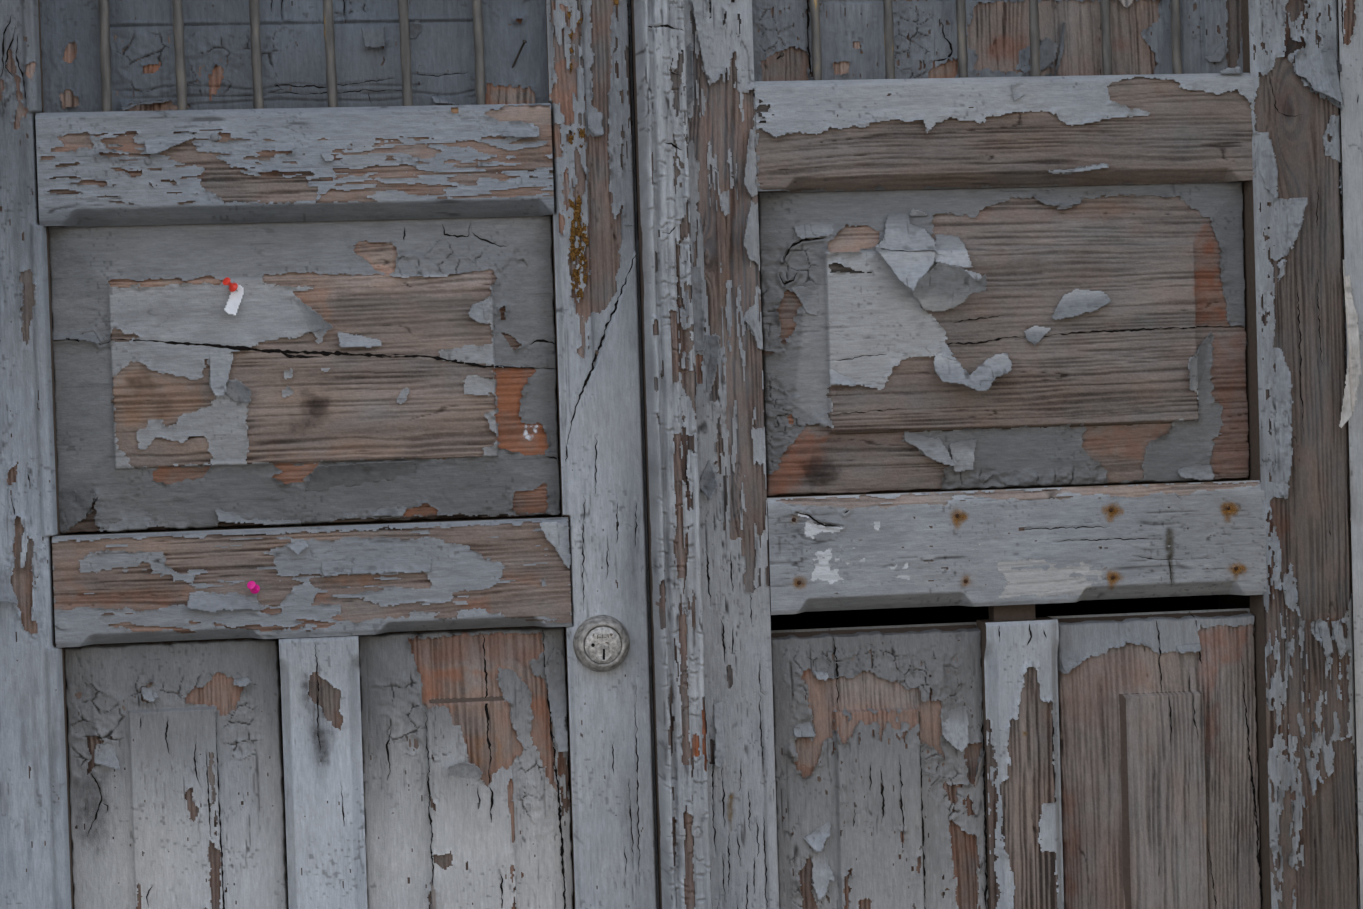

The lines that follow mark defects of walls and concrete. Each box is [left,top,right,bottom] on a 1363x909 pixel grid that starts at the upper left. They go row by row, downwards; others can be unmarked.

rust [1222,503,1236,520]